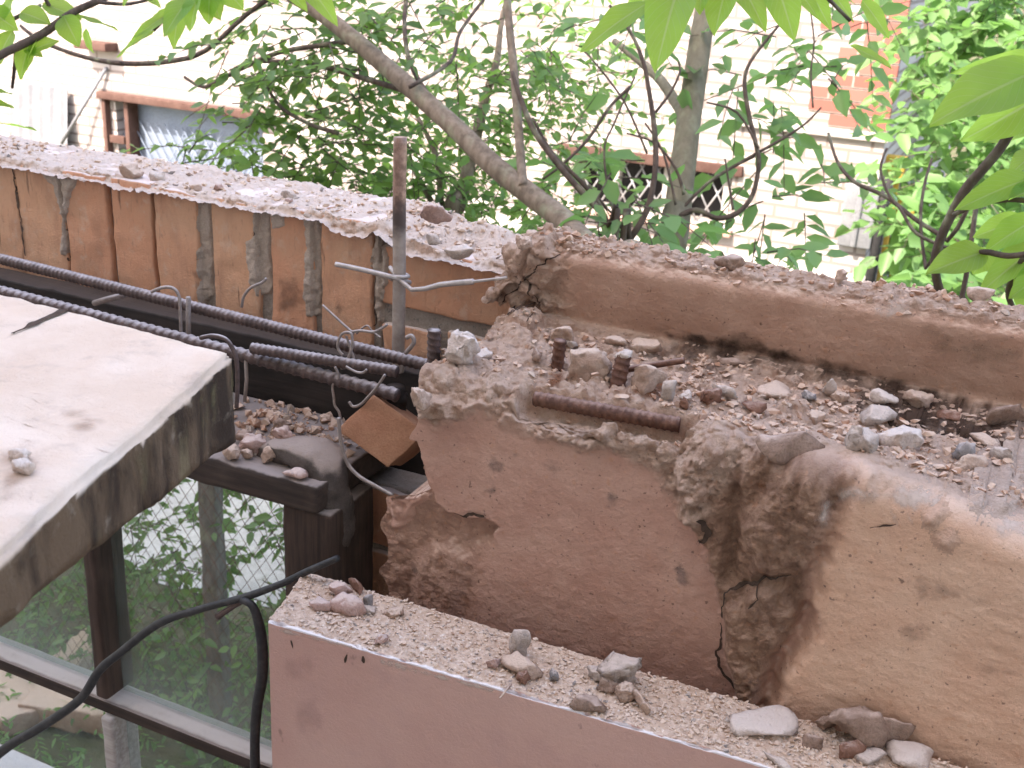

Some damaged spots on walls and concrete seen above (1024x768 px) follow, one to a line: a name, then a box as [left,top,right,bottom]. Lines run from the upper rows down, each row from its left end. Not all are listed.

crack [503,254,560,322]
spalling [532,391,681,433]
flaking render [389,480,431,530]
crack [715,575,790,690]